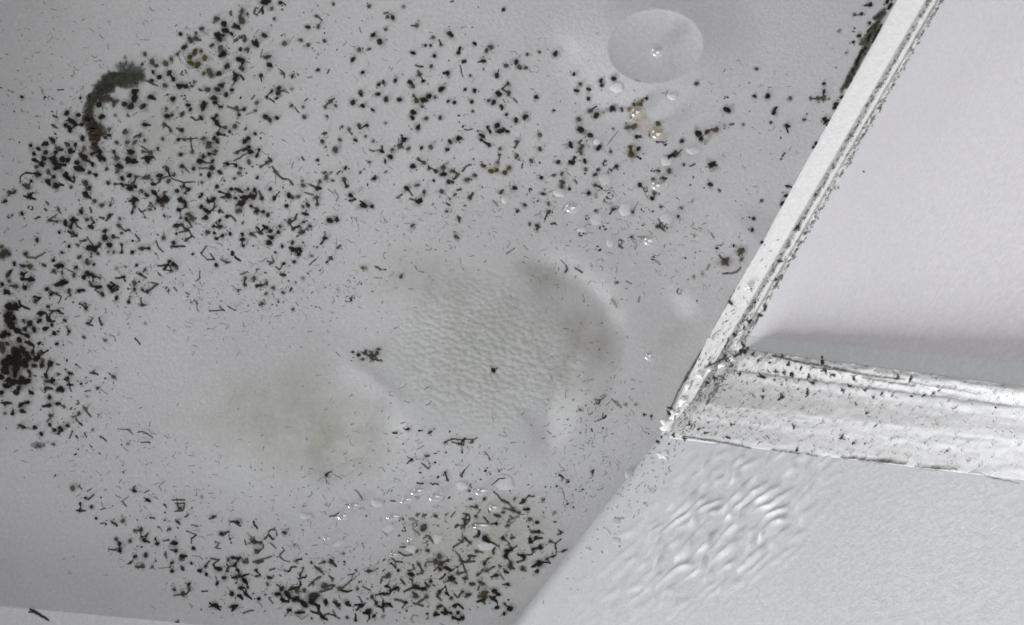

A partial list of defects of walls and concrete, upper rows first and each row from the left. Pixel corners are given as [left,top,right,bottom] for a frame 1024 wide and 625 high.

water stain [0,0,763,461]
water stain [565,0,1020,519]
water stain [70,422,587,625]